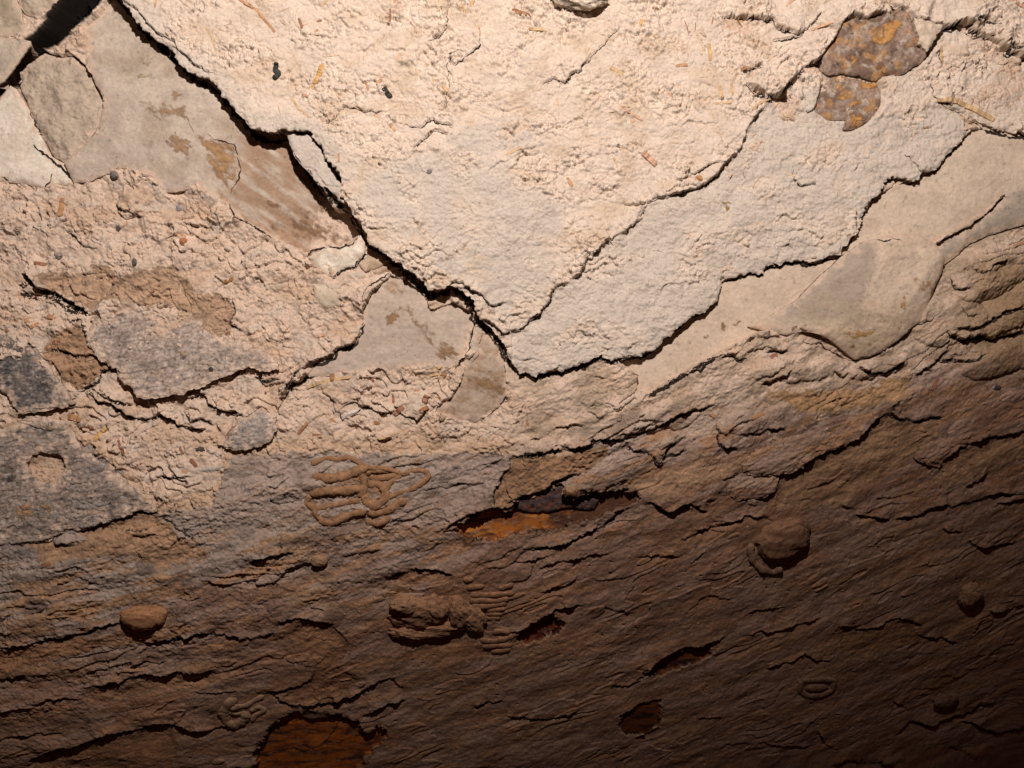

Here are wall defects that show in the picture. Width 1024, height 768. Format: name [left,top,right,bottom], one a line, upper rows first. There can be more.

rust [872,12,903,45]
crack [926,15,1024,62]
crack [931,87,1024,140]
crack [71,0,956,422]
peeling [123,0,1024,377]
crack [648,227,1024,397]
peeling [0,265,279,568]
crack [160,475,188,485]
crack [386,400,942,579]
crack [12,511,199,547]
hole [251,708,387,768]
hole [618,699,662,735]